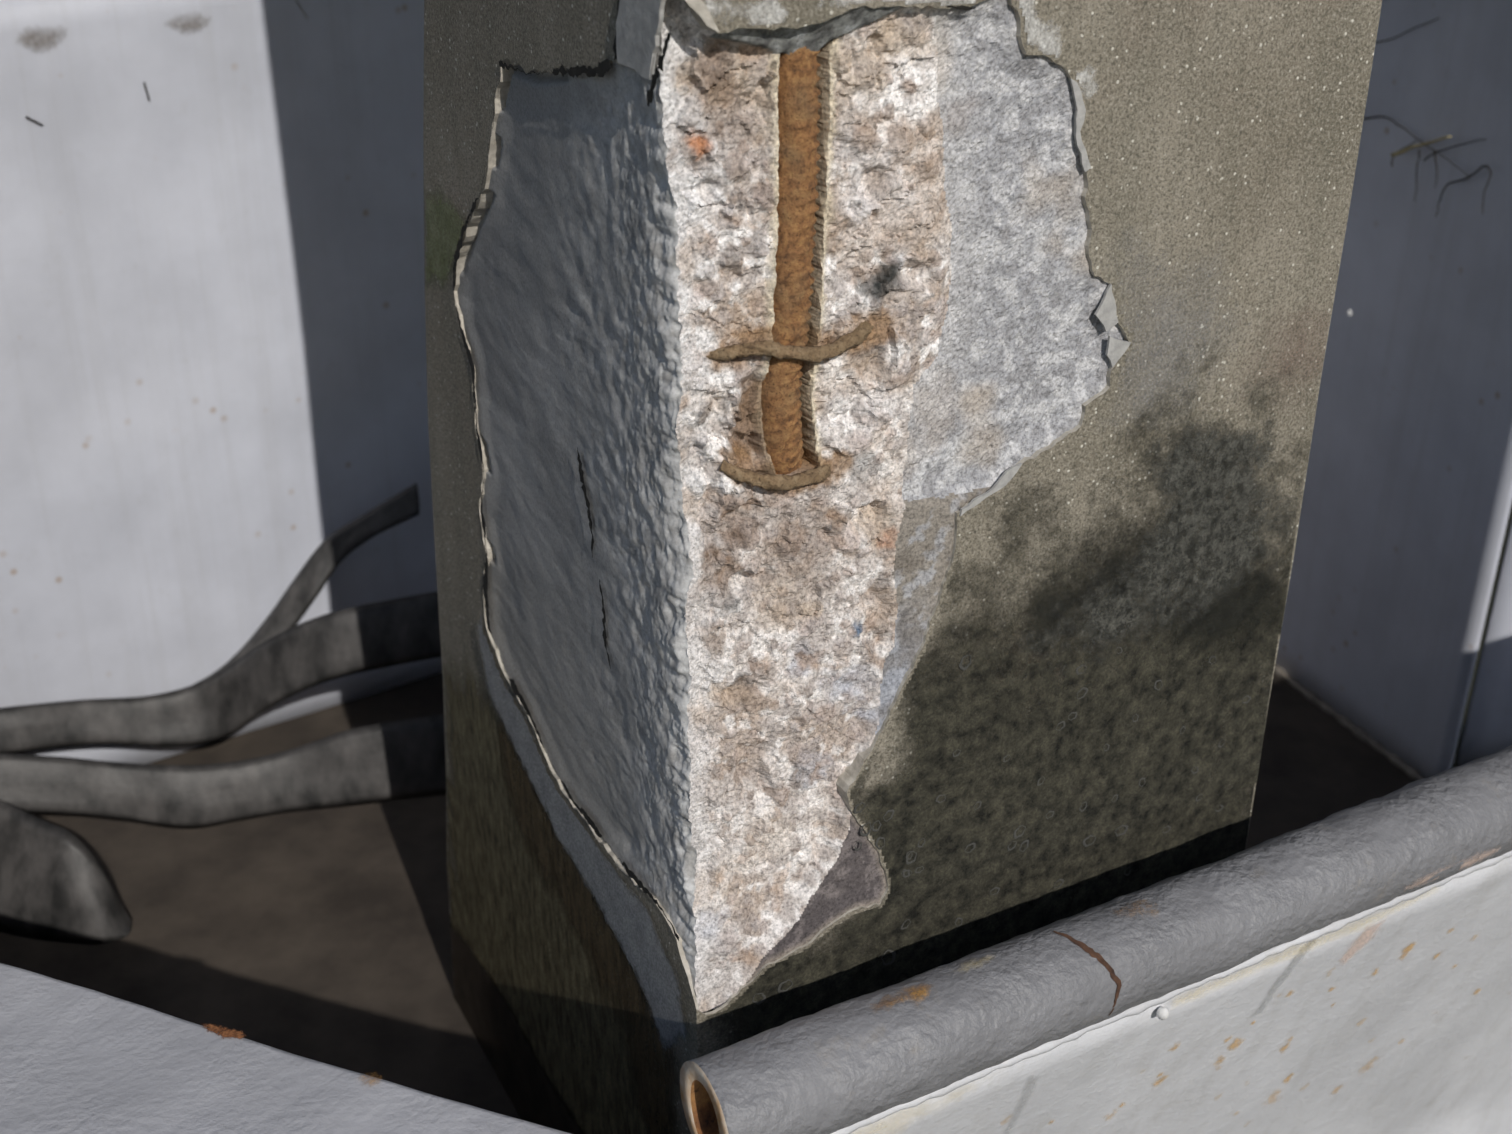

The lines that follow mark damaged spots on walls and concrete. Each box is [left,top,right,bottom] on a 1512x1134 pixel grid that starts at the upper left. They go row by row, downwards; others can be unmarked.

spalling [457,0,1131,1013]
crack [1053,931,1122,1015]